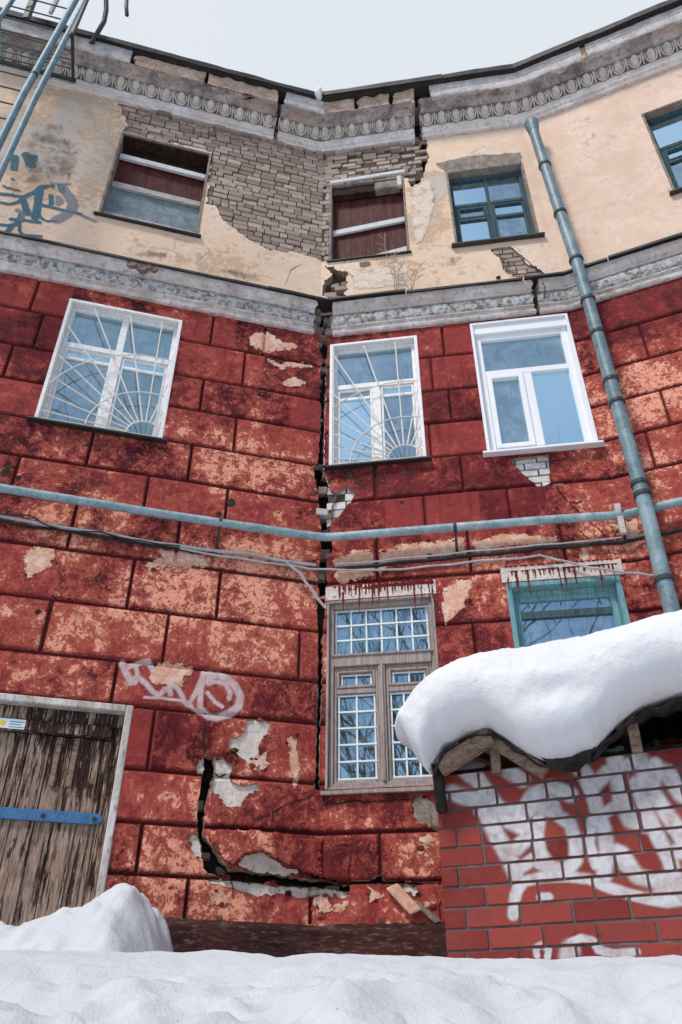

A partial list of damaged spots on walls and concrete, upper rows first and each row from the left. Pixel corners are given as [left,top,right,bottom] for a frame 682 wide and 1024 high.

flaking render [118,104,522,298]
peeling [248,331,312,387]
flaking render [327,478,360,530]
flaking render [510,455,561,486]
peeling [22,544,58,578]
crack [272,337,414,820]
peeling [332,531,558,585]
peeling [442,578,473,626]
spalling [196,718,271,808]
crack [191,701,441,920]
spalling [207,852,351,919]
spalling [401,795,440,910]